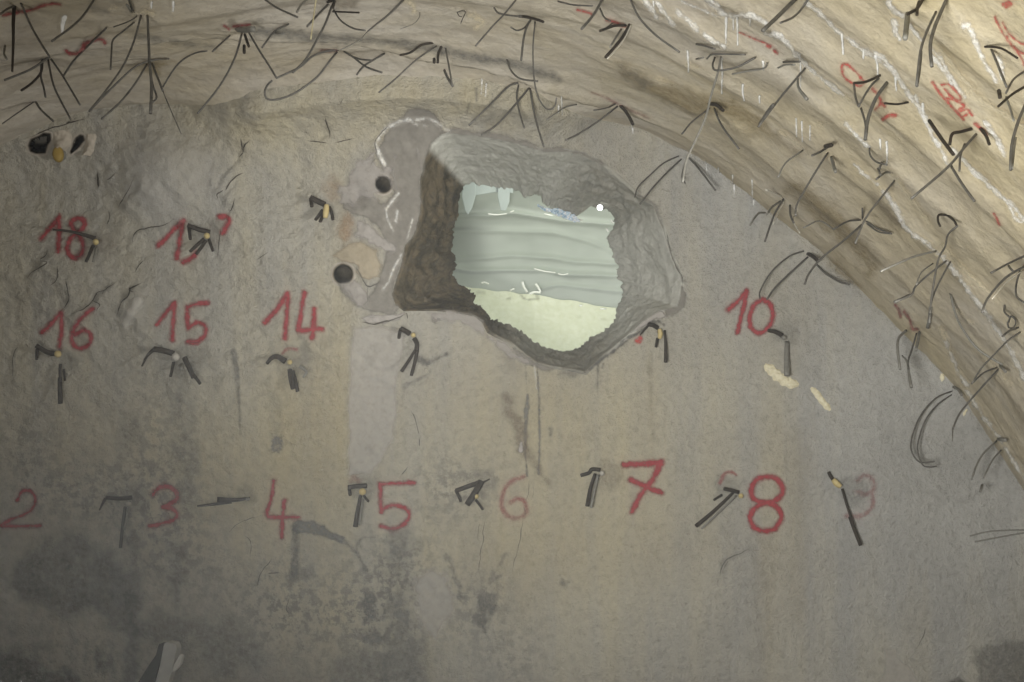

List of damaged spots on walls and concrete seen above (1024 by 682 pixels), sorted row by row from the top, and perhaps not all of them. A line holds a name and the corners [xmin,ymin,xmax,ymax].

spalling [432,311,550,370]
spalling [589,287,686,370]
damp [288,520,344,581]